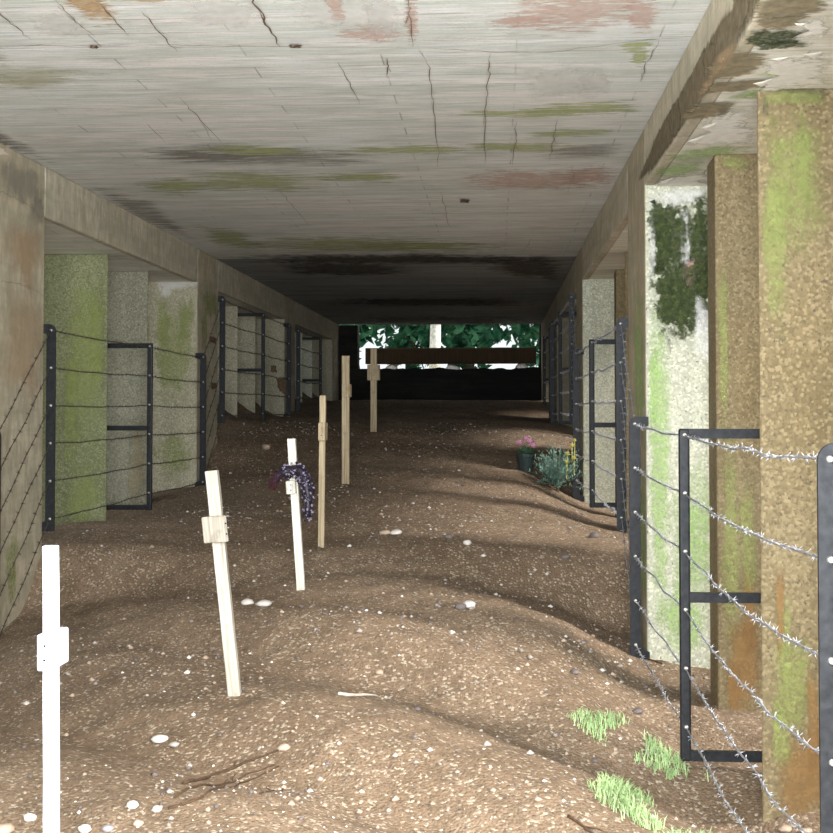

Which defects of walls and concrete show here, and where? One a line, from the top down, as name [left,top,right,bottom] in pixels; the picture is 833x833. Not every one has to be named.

corrosion [66,0,115,20]
crack [251,0,297,47]
corrosion [337,0,419,42]
corrosion [493,0,656,33]
crack [356,0,687,166]
damp [640,0,826,179]
damp [171,145,358,164]
damp [324,173,394,181]
damp [281,243,557,278]
damp [647,190,708,357]
corrosion [729,603,756,710]